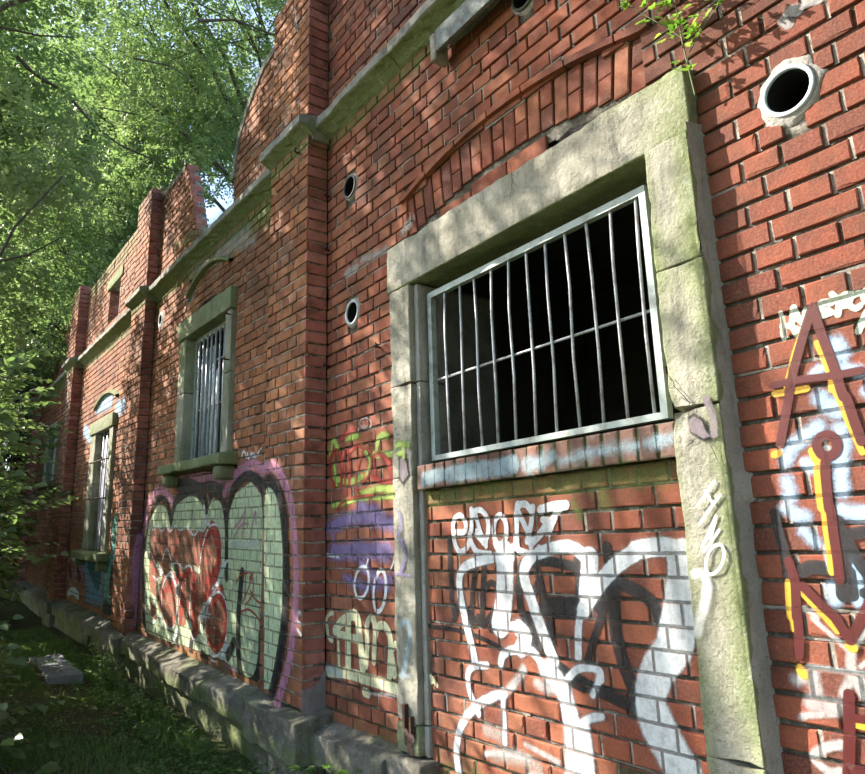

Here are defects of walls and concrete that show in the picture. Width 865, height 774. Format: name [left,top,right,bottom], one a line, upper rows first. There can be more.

spalling [778,0,822,29]
damp [345,246,386,276]
spalling [688,395,717,441]
corrosion [404,726,416,757]